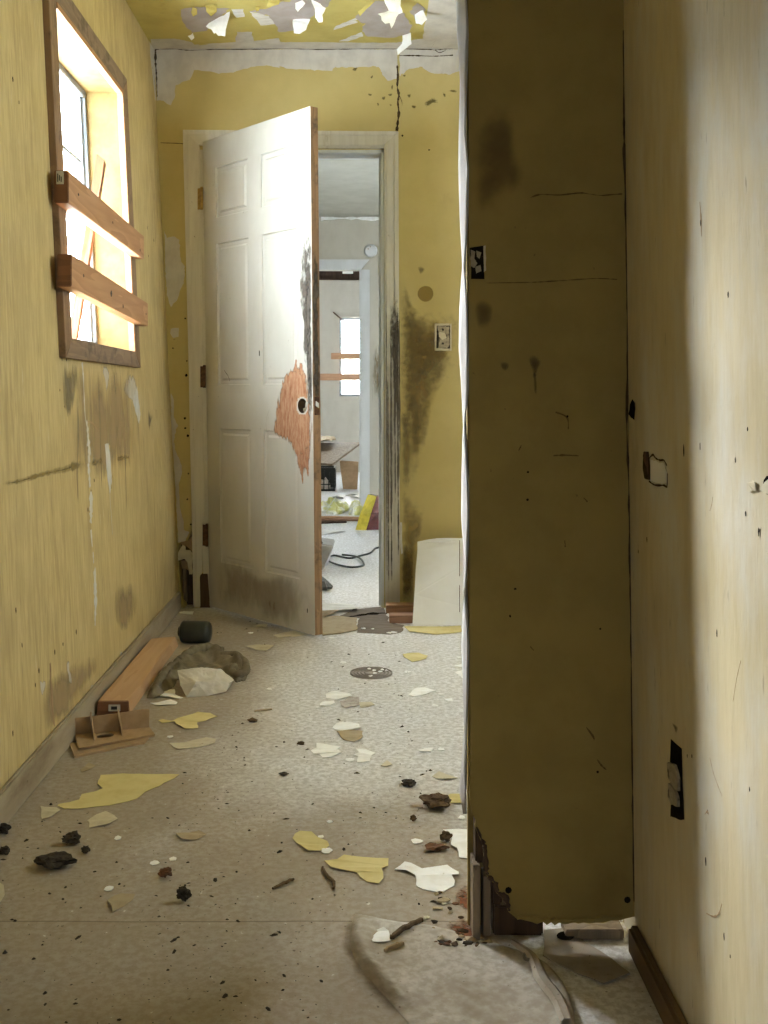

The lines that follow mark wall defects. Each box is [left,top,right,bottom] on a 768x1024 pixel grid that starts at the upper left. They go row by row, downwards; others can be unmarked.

crack [152,49,268,96]
crack [395,49,453,131]
damp [409,286,433,306]
peeling [125,375,141,422]
peeling [150,0,469,814]
crack [16,456,128,483]
damp [374,308,445,590]
crack [502,30,635,902]